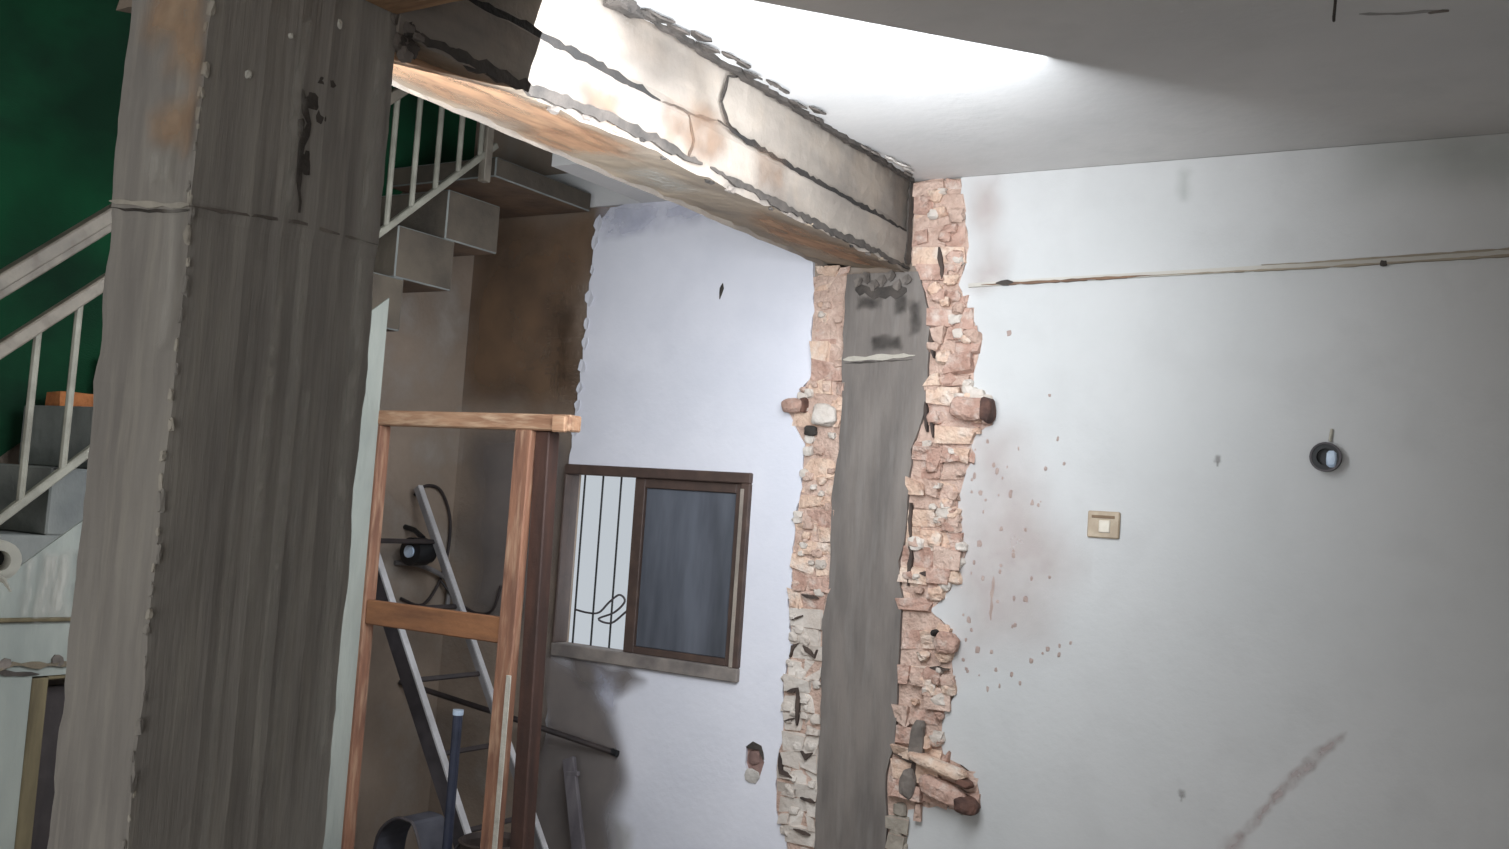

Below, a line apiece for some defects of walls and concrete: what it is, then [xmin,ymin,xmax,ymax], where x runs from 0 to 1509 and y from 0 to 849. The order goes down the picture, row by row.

crack [469,0,915,265]
flaking render [391,0,1021,849]